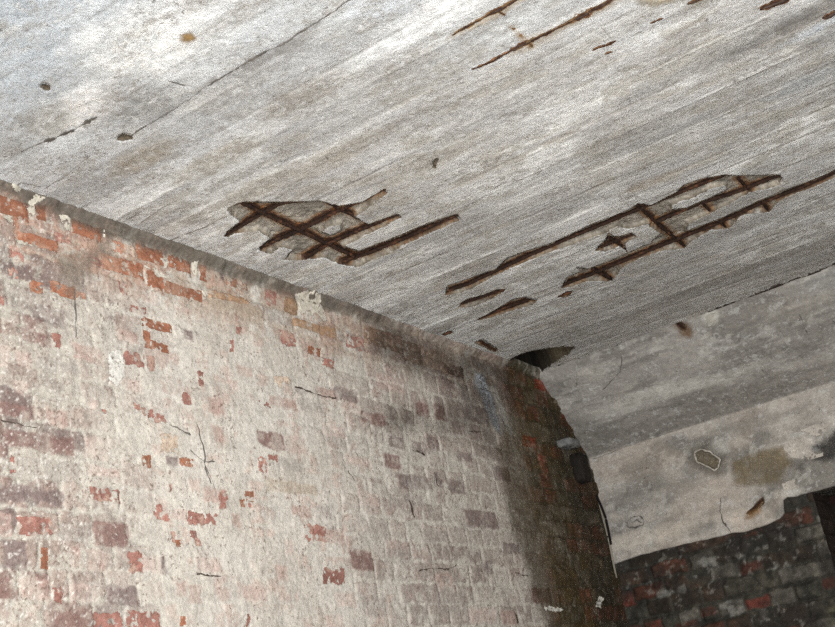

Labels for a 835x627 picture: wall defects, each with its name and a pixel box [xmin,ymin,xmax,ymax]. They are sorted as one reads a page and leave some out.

crack [132,0,350,136]
crack [21,117,97,152]
spalling [224,189,459,267]
spalling [444,170,835,308]
crack [171,425,215,488]
spalling [694,449,721,471]
damp [816,431,835,460]